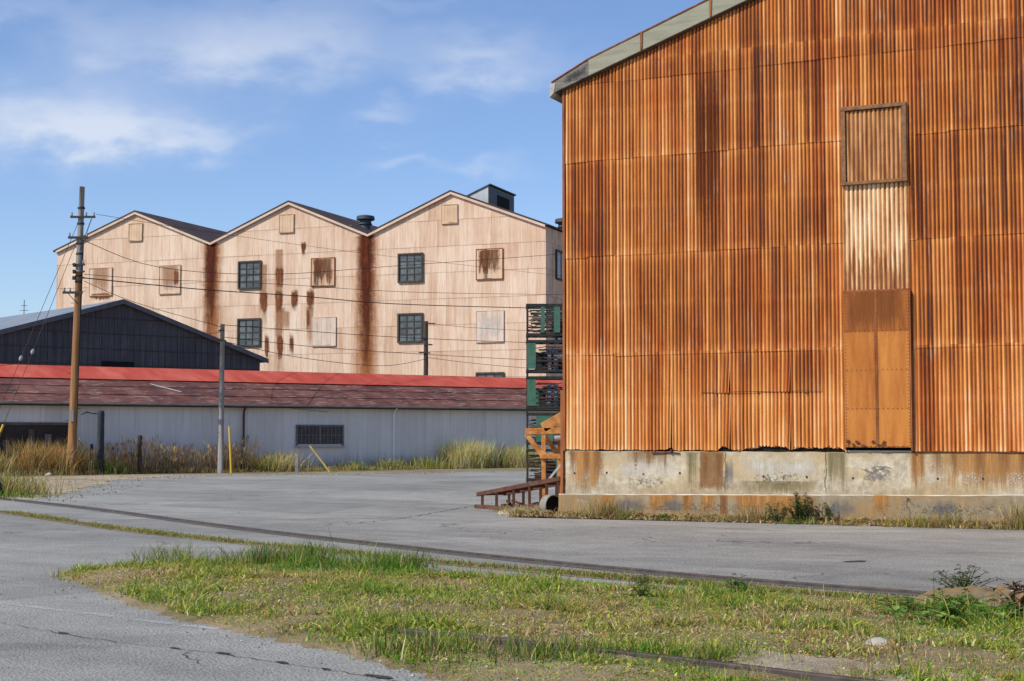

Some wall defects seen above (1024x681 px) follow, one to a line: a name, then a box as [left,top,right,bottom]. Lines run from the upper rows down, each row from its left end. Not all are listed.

corrosion [696,83,717,207]
corrosion [205,244,220,338]
corrosion [259,249,332,359]
corrosion [357,235,376,374]
corrosion [479,249,498,273]
corrosion [651,452,816,516]
corrosion [911,452,1024,486]